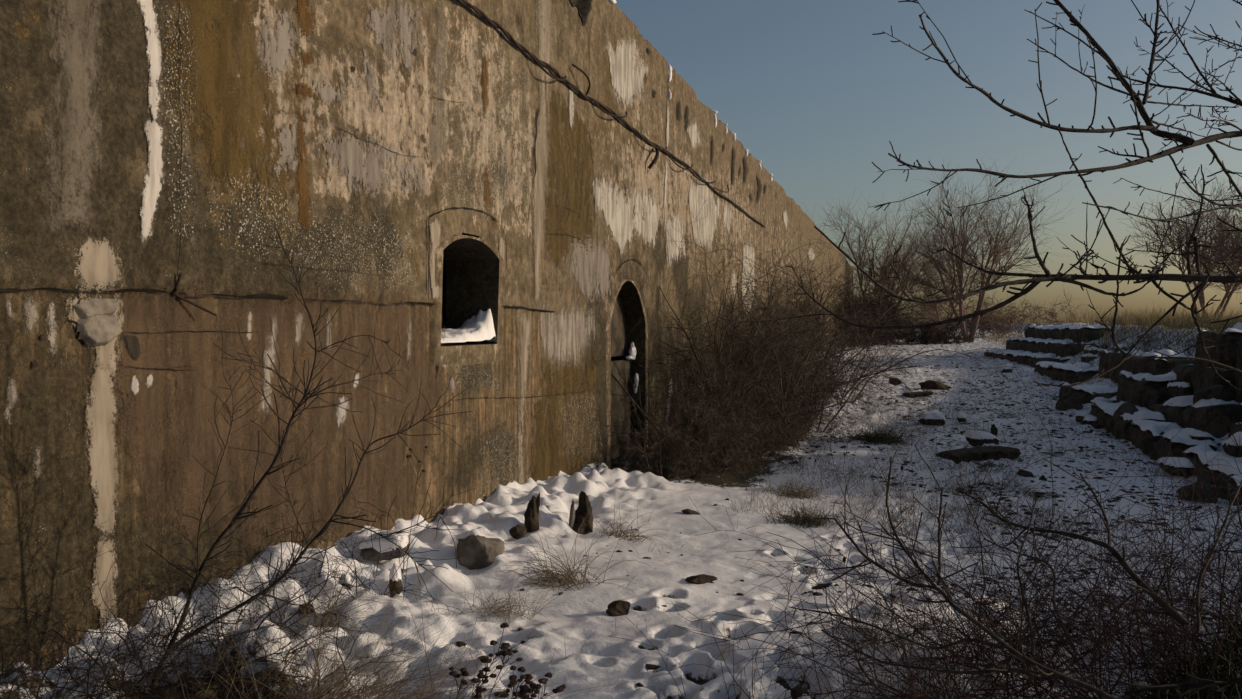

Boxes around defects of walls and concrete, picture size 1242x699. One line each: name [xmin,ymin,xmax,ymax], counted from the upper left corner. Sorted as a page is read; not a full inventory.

damp [137,0,299,242]
peeling [255,7,298,84]
crack [0,0,595,349]
peeling [268,0,428,198]
peeling [606,36,656,107]
peeling [591,100,766,267]
peeling [66,234,141,630]
crack [121,364,200,372]
damp [107,269,455,556]